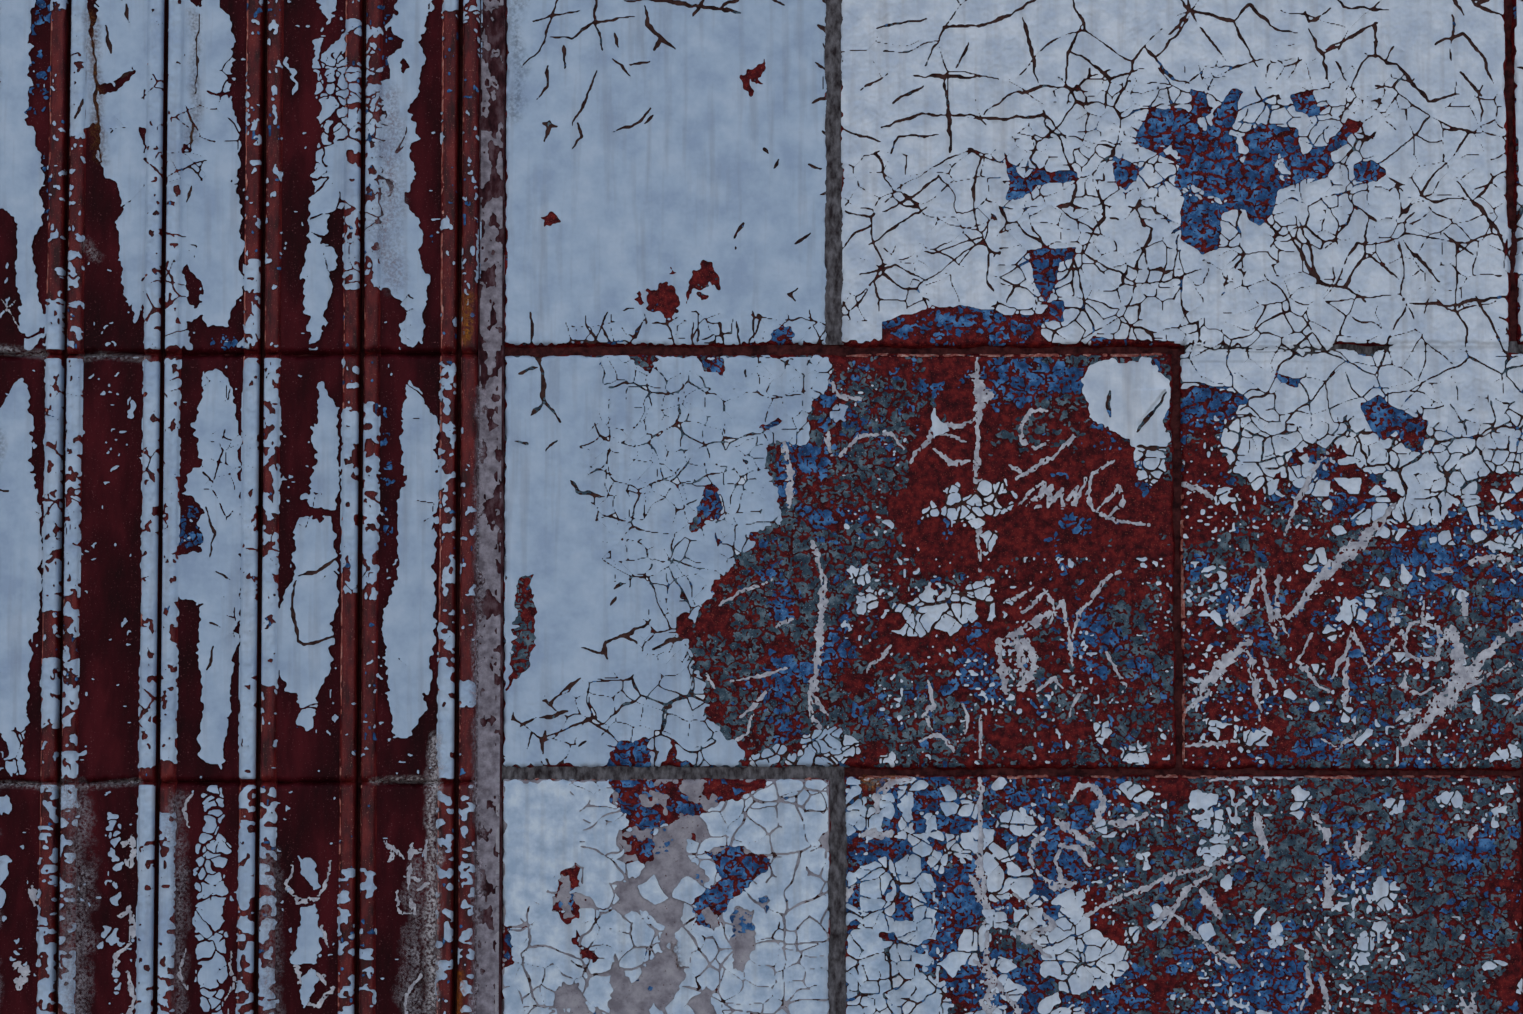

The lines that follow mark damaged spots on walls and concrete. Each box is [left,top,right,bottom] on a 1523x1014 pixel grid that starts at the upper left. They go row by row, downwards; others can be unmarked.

peeling [0,0,1022,1014]
crack [503,0,1523,1014]
peeling [841,0,1523,768]
peeling [846,646,1522,1014]